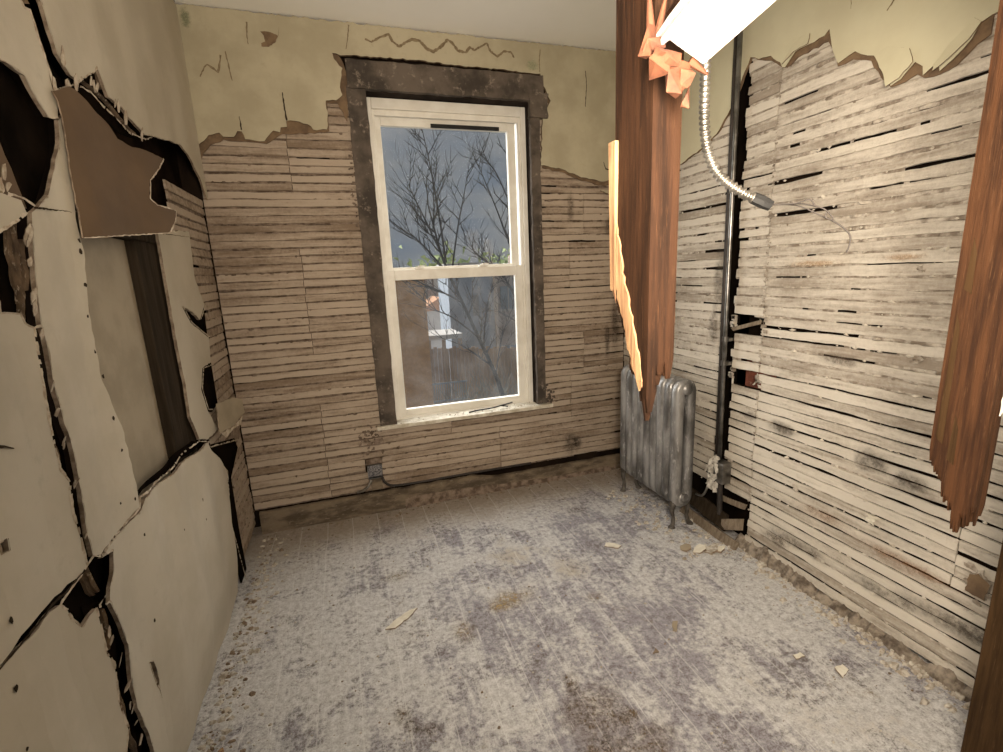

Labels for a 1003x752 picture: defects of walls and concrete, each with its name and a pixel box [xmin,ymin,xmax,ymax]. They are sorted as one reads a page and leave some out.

crack [346,25,514,58]
flaking render [782,33,810,64]
flaking render [874,46,913,87]
flaking render [932,18,982,71]
crack [0,569,85,670]